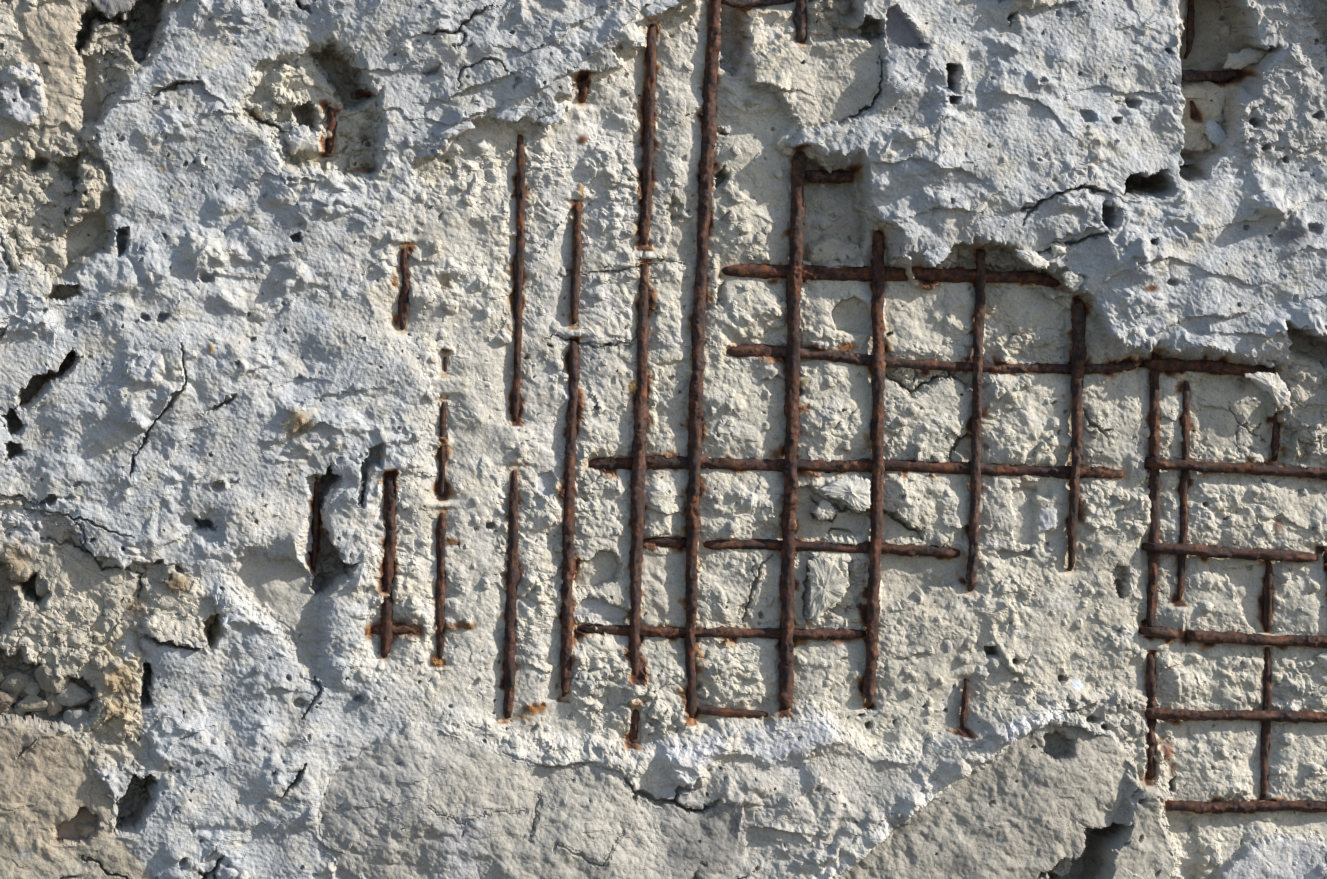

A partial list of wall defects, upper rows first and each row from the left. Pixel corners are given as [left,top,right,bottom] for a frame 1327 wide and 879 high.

spalling [0,0,179,279]
spalling [235,43,382,177]
rust [352,89,373,98]
crack [0,324,9,343]
crack [127,341,239,480]
spalling [360,0,1327,879]
spalling [0,497,216,879]
rust [368,621,422,637]
rust [446,621,475,630]
rust [518,702,547,720]